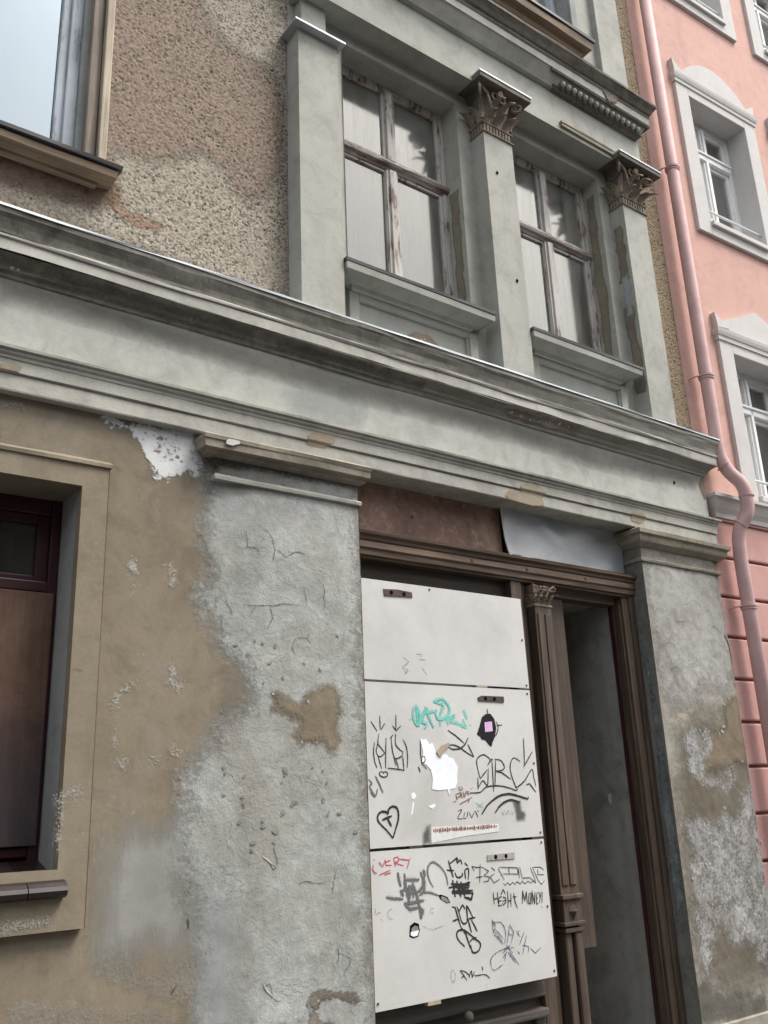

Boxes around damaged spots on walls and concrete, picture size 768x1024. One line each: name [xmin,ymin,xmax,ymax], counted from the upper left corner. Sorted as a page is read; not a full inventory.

flaking render [614,227,646,394]
crack [225,584,325,629]
flaking render [100,415,375,1024]